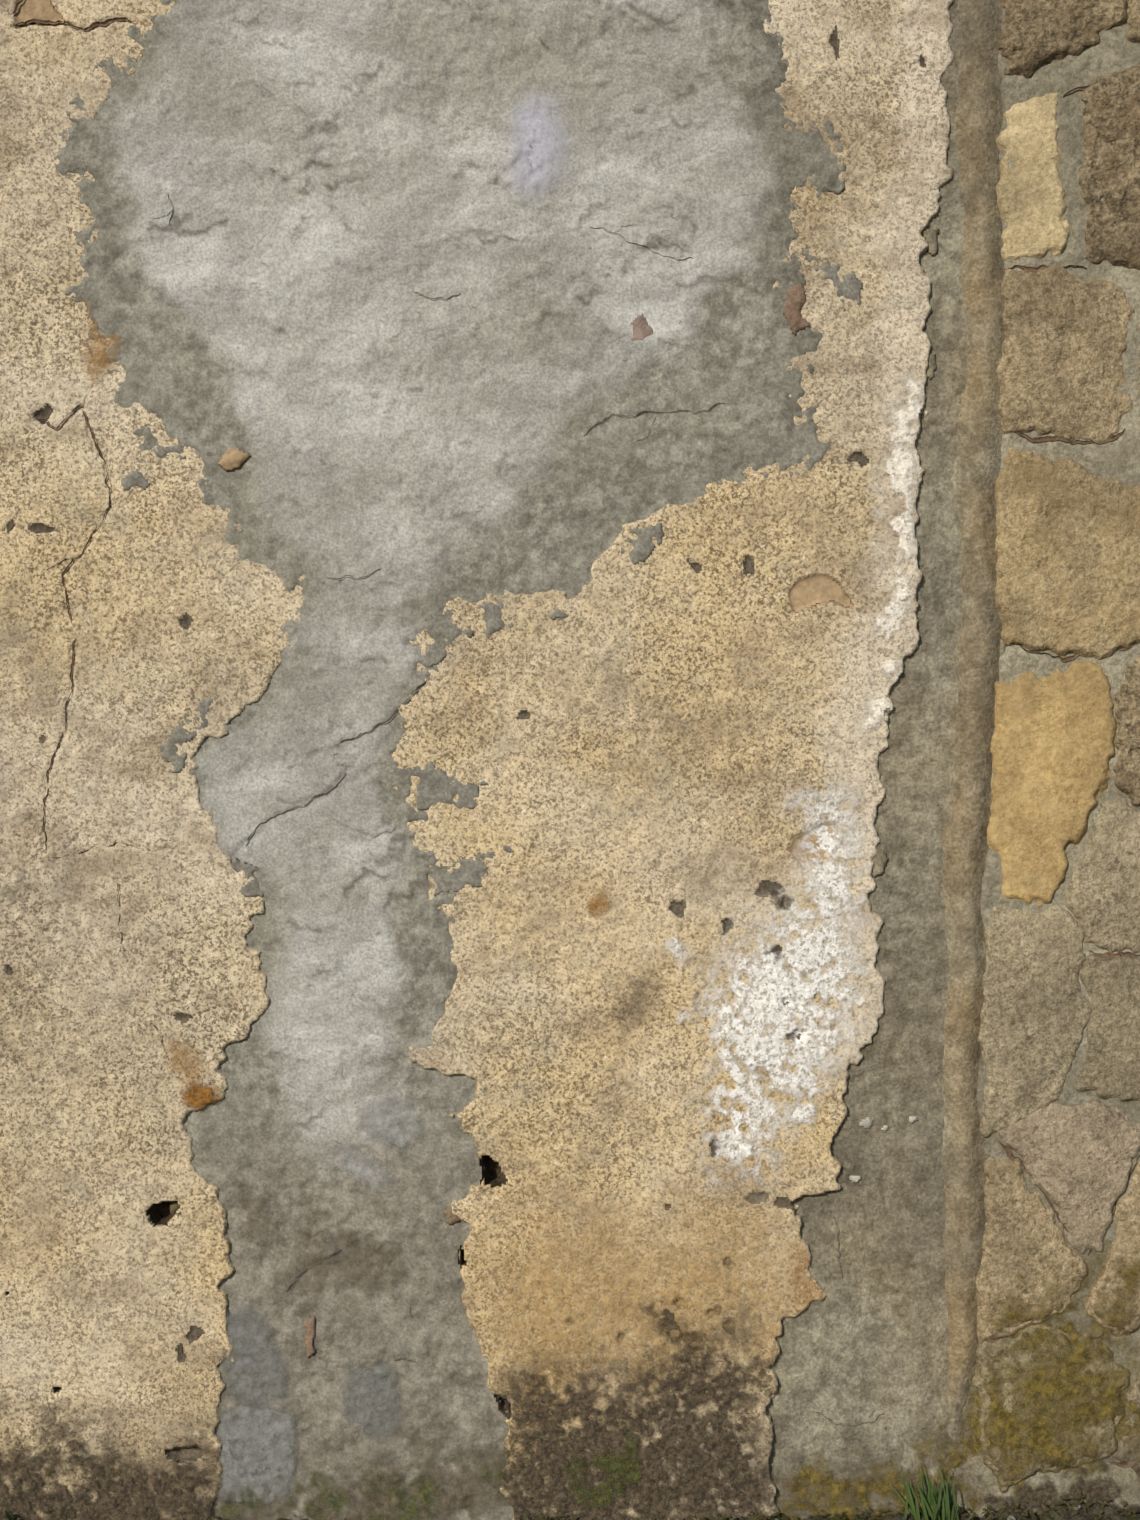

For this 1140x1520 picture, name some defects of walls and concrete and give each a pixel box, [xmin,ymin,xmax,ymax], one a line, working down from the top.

crack [33,405,149,978]
spalling [50,0,869,1520]
leakage [667,936,684,959]
leakage [680,791,866,1176]
peeling [745,0,977,1520]
leakage [0,1307,775,1520]